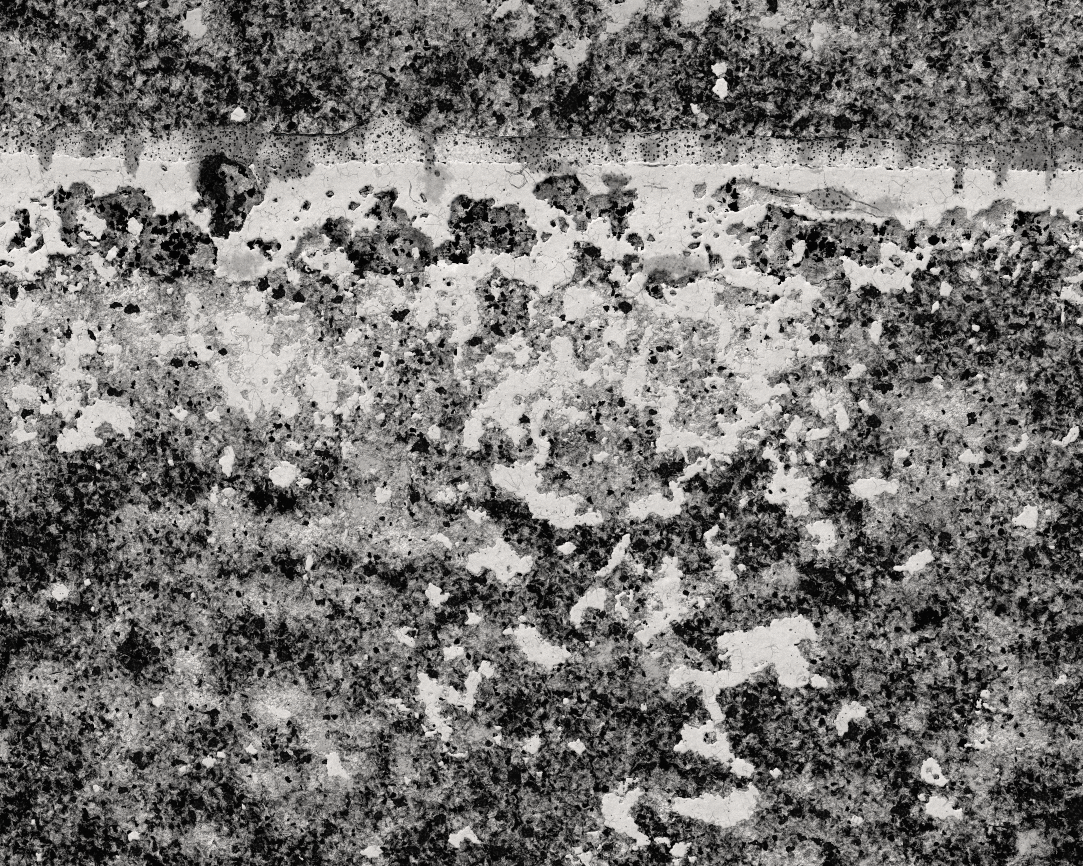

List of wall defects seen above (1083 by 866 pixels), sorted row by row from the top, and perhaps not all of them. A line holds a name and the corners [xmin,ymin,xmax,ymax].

leakage [120,132,143,177]
leakage [188,125,314,192]
leakage [520,130,582,175]
leakage [636,137,664,163]
leakage [947,140,969,194]
leakage [990,138,1060,190]
peeling [0,150,1083,571]
peeling [430,533,535,586]
peeling [425,583,483,625]
peeling [384,660,502,766]
peeling [503,513,838,866]
peeling [882,721,1005,821]